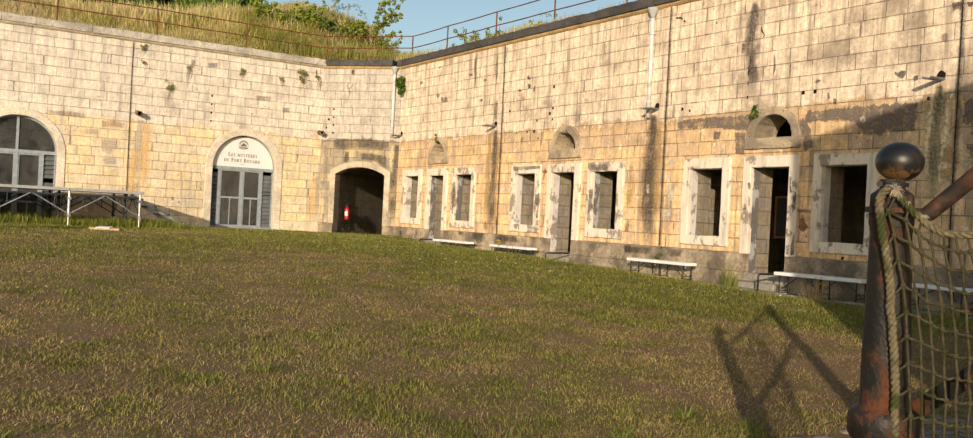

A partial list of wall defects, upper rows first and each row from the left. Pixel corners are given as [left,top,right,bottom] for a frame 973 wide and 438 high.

leakage [742,4,759,79]
leakage [924,86,971,194]